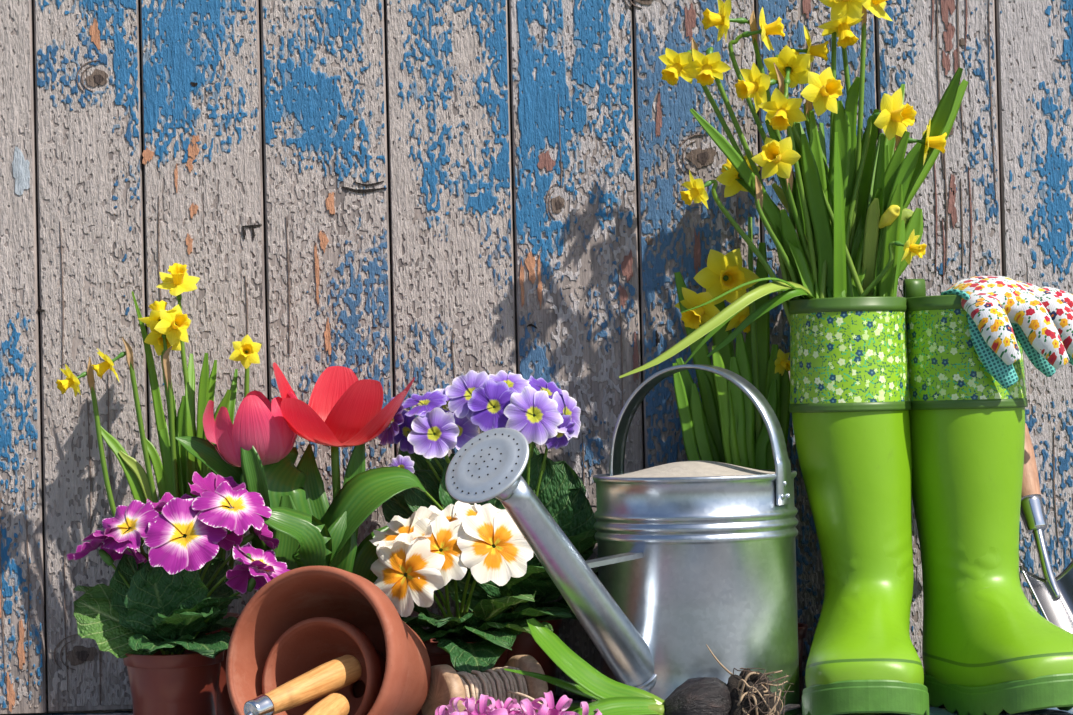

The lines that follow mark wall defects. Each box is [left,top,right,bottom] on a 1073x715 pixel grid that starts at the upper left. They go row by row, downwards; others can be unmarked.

peeling [0,0,265,715]
peeling [429,587,472,617]
peeling [555,666,592,706]
peeling [262,0,1073,507]
peeling [787,413,825,685]
peeling [909,500,924,668]
peeling [1019,350,1073,617]